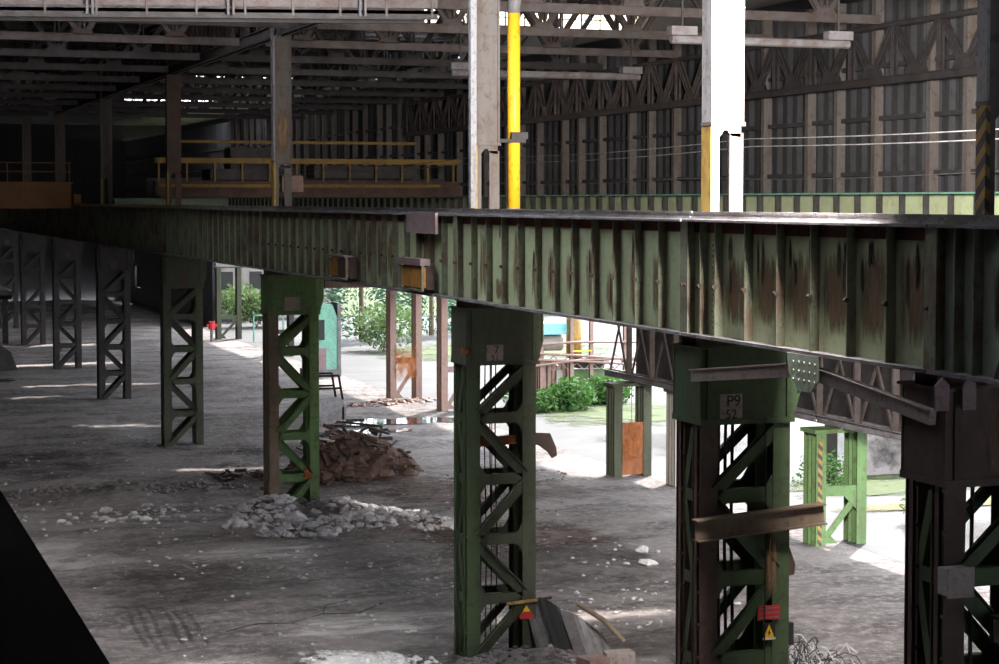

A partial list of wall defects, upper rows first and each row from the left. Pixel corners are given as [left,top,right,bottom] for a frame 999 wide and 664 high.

corrosion [726,237,744,323]
corrosion [757,239,776,323]